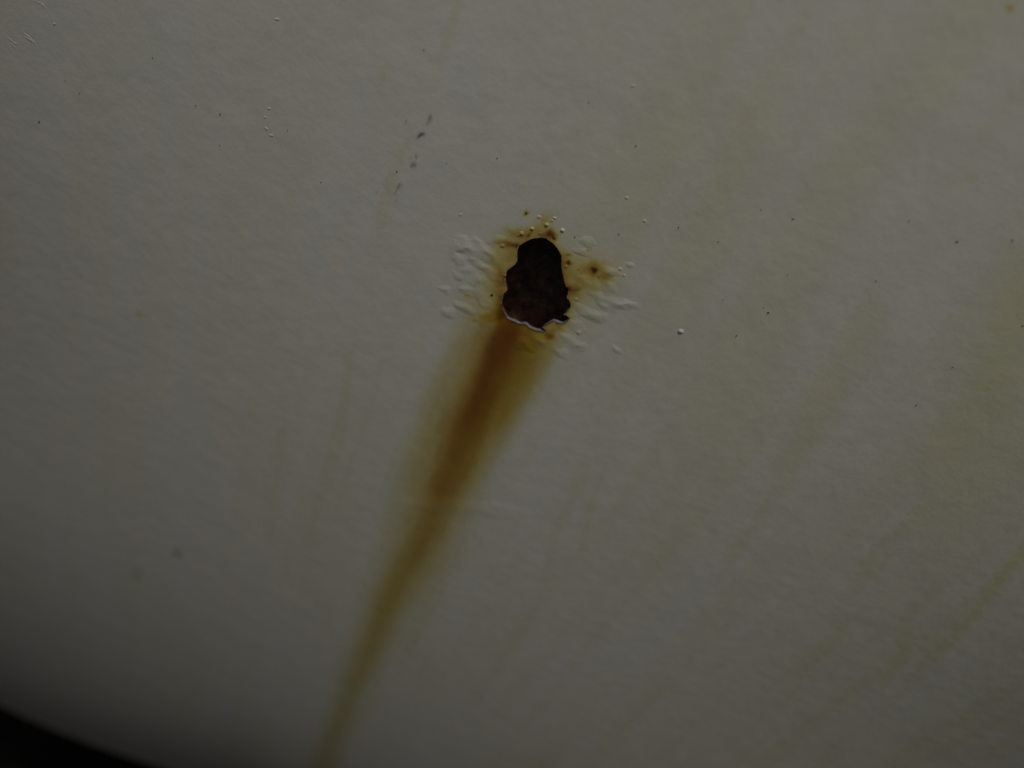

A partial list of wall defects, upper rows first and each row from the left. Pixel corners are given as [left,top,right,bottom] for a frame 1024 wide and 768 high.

spalling [502,237,570,330]